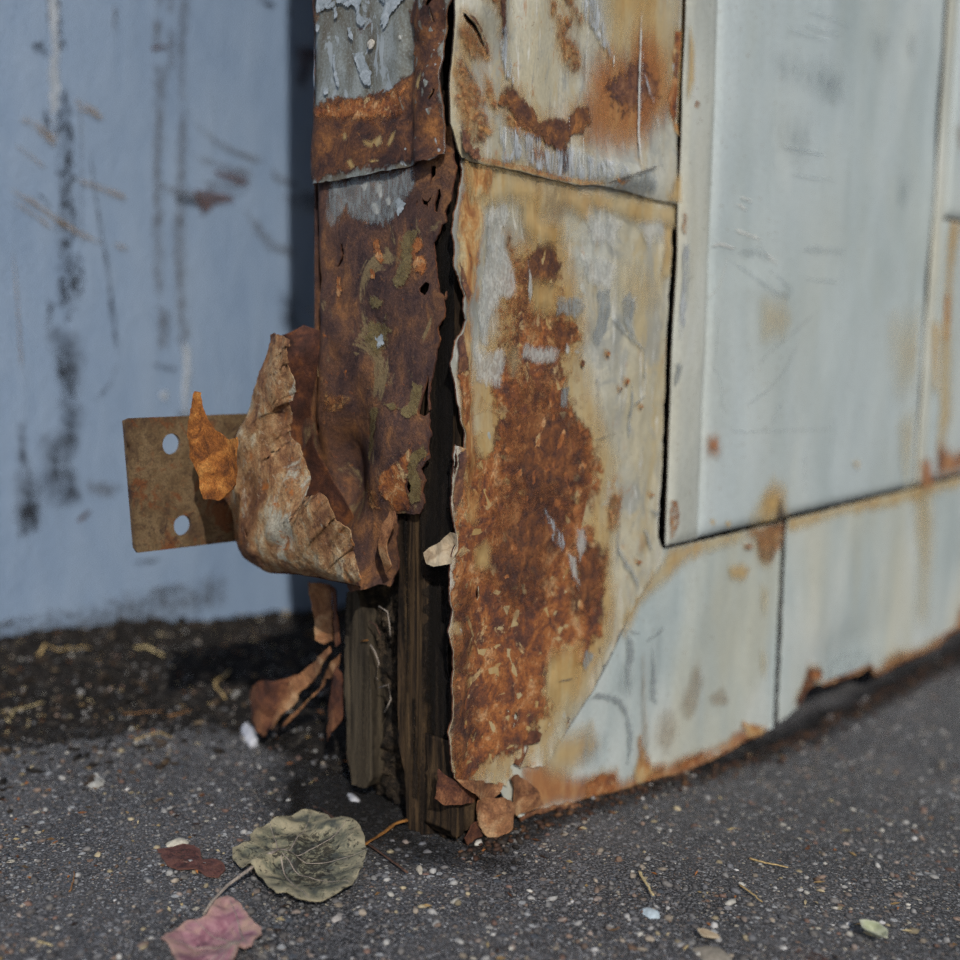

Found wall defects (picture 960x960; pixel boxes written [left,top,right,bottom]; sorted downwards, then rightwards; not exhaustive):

peeling [316,0,366,40]
peeling [380,0,403,28]
peeling [352,51,372,86]
rust [299,0,446,183]
rust [410,237,426,275]
peeling [364,296,392,356]
rust [450,0,700,780]
rust [187,391,239,501]
rust [367,449,412,511]
peeling [368,382,422,463]
peeling [407,446,427,504]
rust [518,722,766,822]